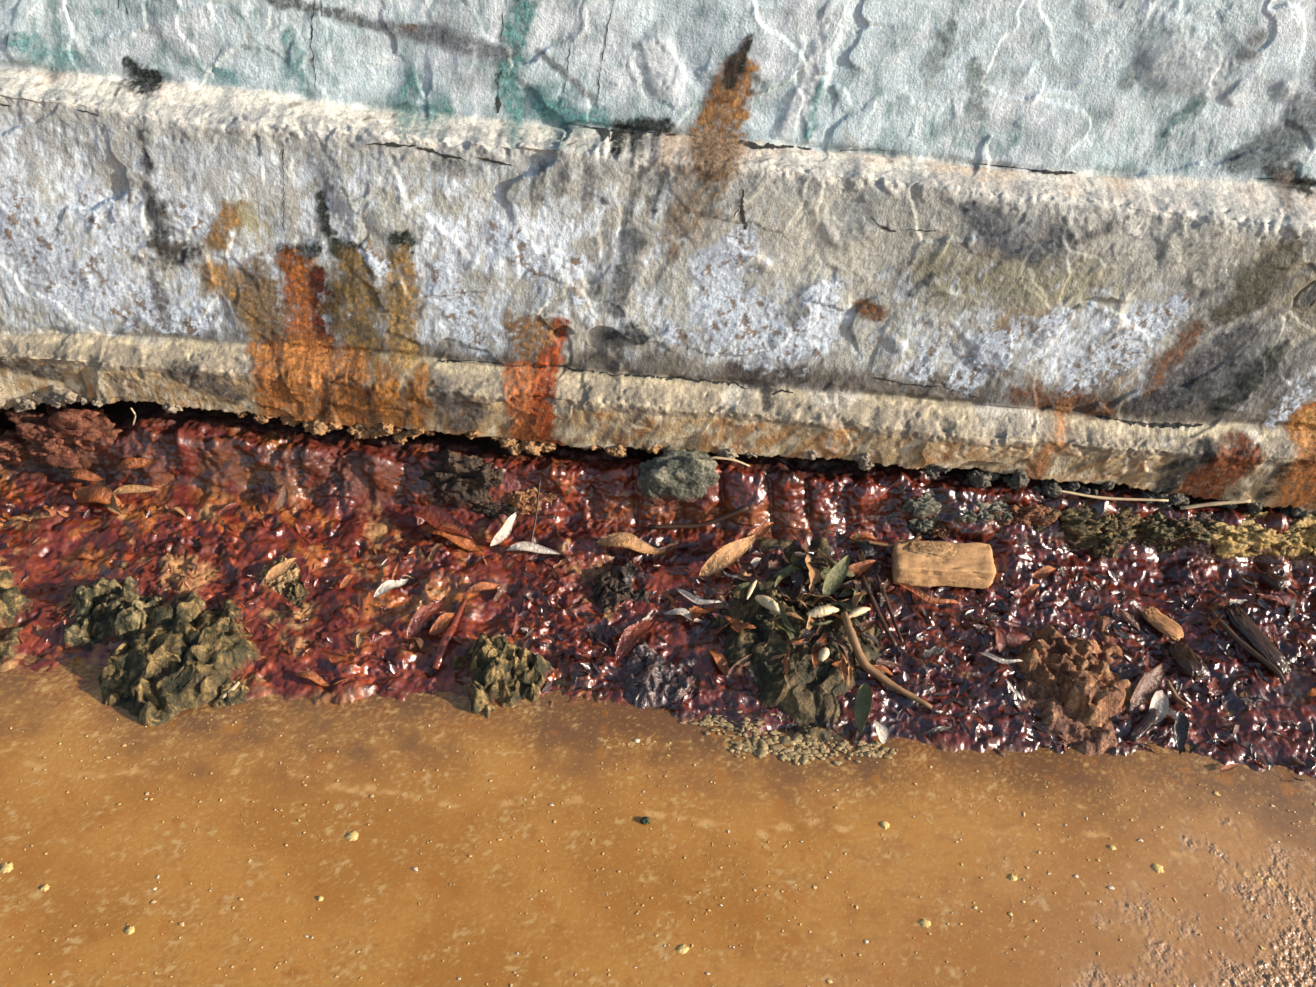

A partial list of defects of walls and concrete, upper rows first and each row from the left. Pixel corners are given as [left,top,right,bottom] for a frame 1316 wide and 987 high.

crack [310,0,322,90]
leakage [1239,32,1267,60]
leakage [133,129,203,328]
crack [279,145,287,233]
leakage [269,0,675,345]
rust [666,34,760,261]
leakage [1160,95,1208,138]
leakage [1226,68,1316,209]
rust [203,201,433,429]
rust [504,310,570,446]
rust [1155,402,1316,511]